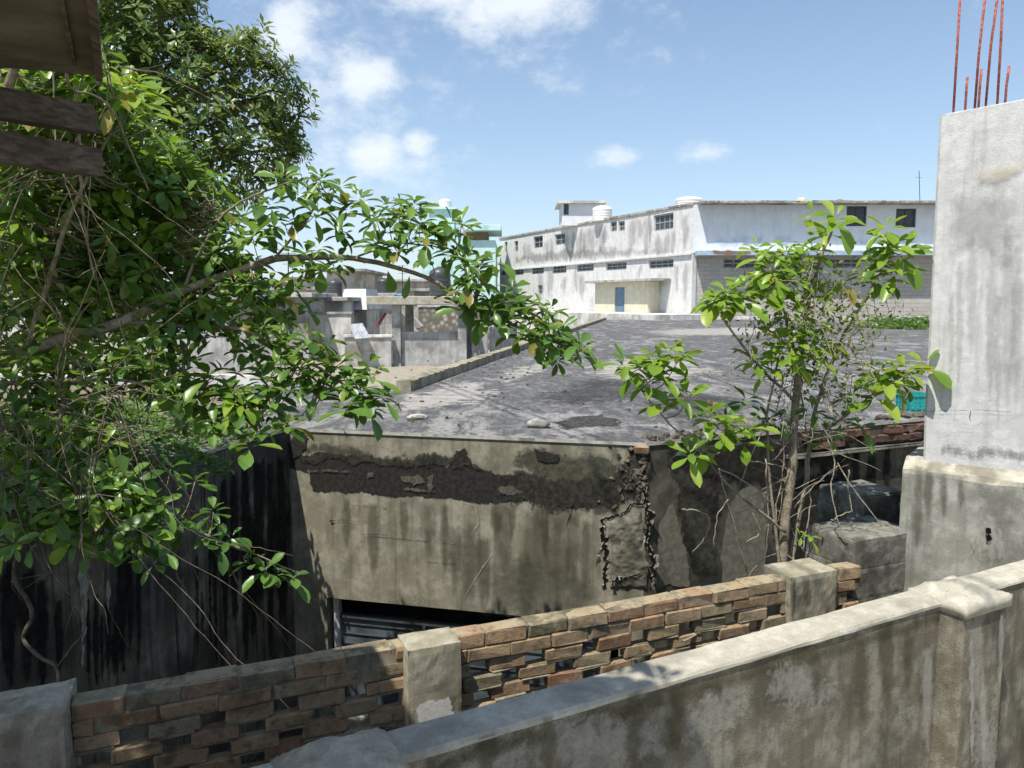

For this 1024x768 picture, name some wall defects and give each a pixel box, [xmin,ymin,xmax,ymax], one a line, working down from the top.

flaking render [289,434,548,504]
flaking render [534,449,559,463]
damp [500,448,624,515]
spalling [556,445,653,509]
damp [196,443,485,664]
damp [0,563,64,686]
damp [86,528,142,685]